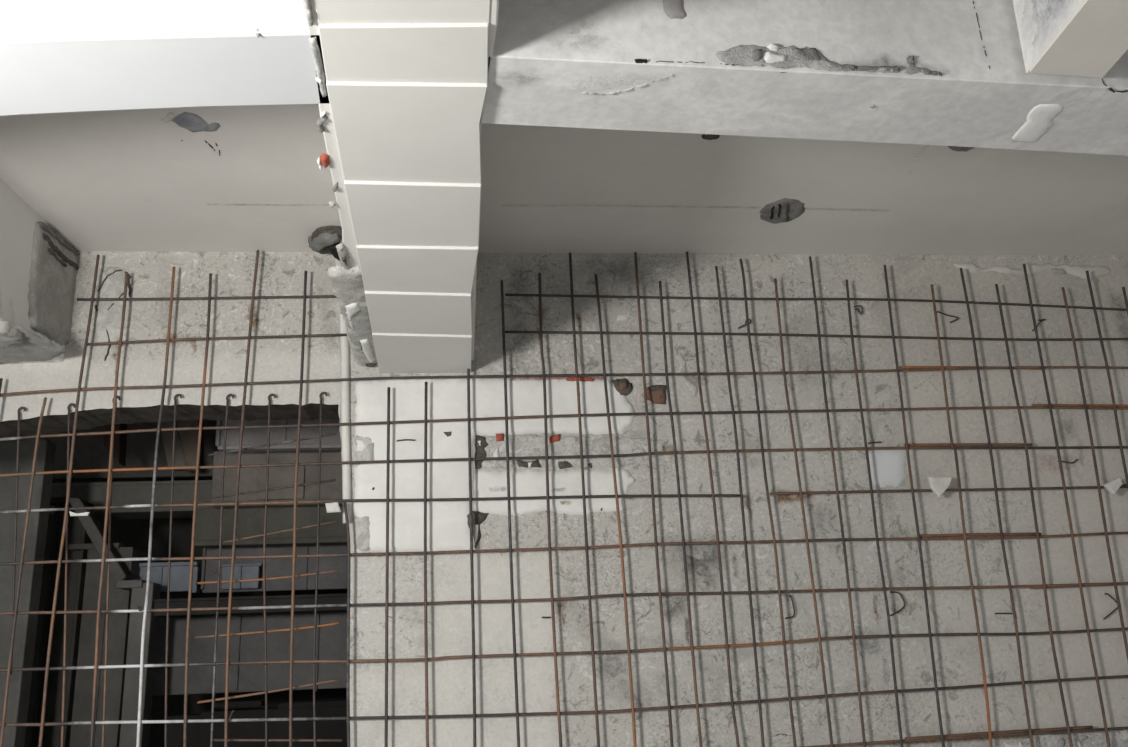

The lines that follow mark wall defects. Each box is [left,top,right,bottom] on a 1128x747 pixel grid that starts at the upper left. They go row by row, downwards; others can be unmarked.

peeling [663,0,687,19]
peeling [716,43,943,76]
spalling [161,112,221,156]